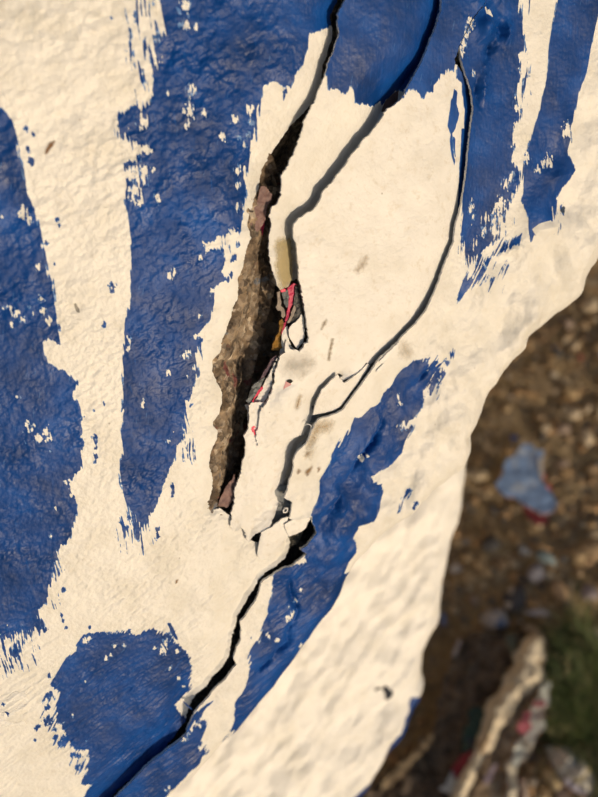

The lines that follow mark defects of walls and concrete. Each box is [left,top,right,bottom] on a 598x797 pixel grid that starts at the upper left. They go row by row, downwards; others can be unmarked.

crack [321,0,343,81]
crack [381,90,399,112]
crack [259,102,314,206]
peeling [207,0,486,559]
crack [310,361,375,422]
crack [160,485,314,753]
crack [112,770,140,797]